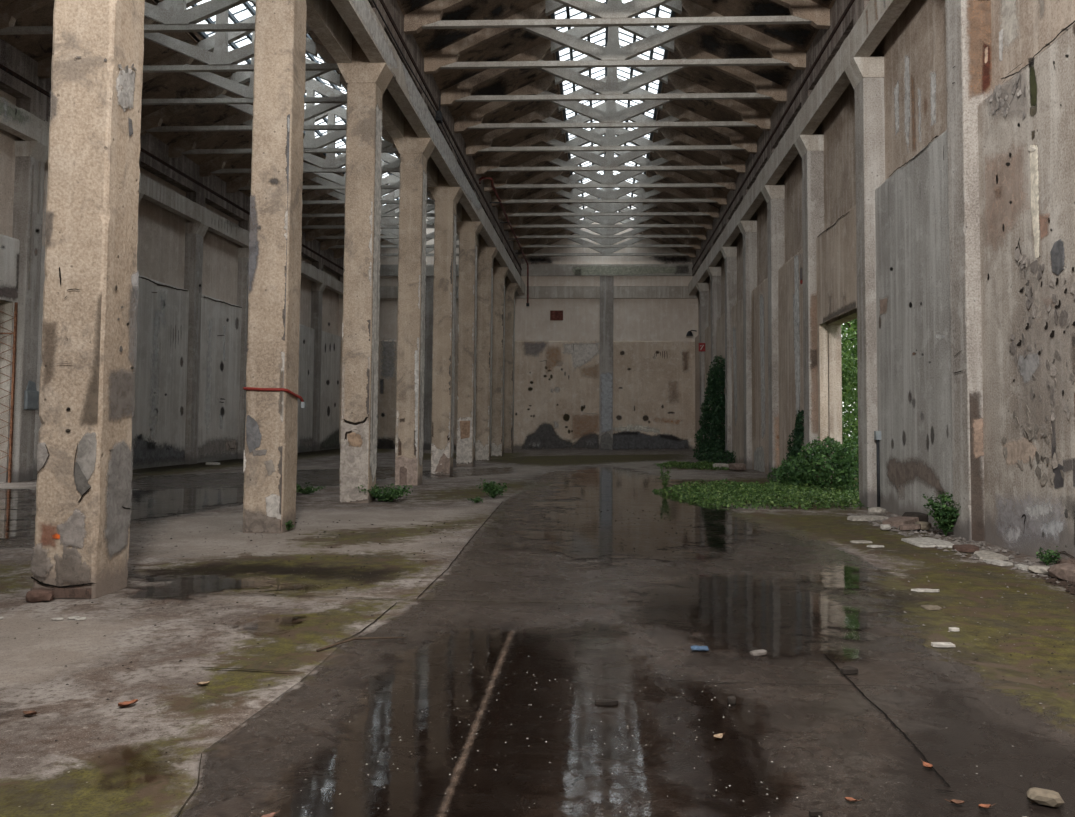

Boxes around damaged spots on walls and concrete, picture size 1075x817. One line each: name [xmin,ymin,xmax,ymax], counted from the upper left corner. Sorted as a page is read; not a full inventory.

flaking render [1001,247,1075,485]
leakage [522,373,689,450]
leakage [886,431,945,498]
leakage [909,391,934,448]
leakage [1051,412,1075,488]